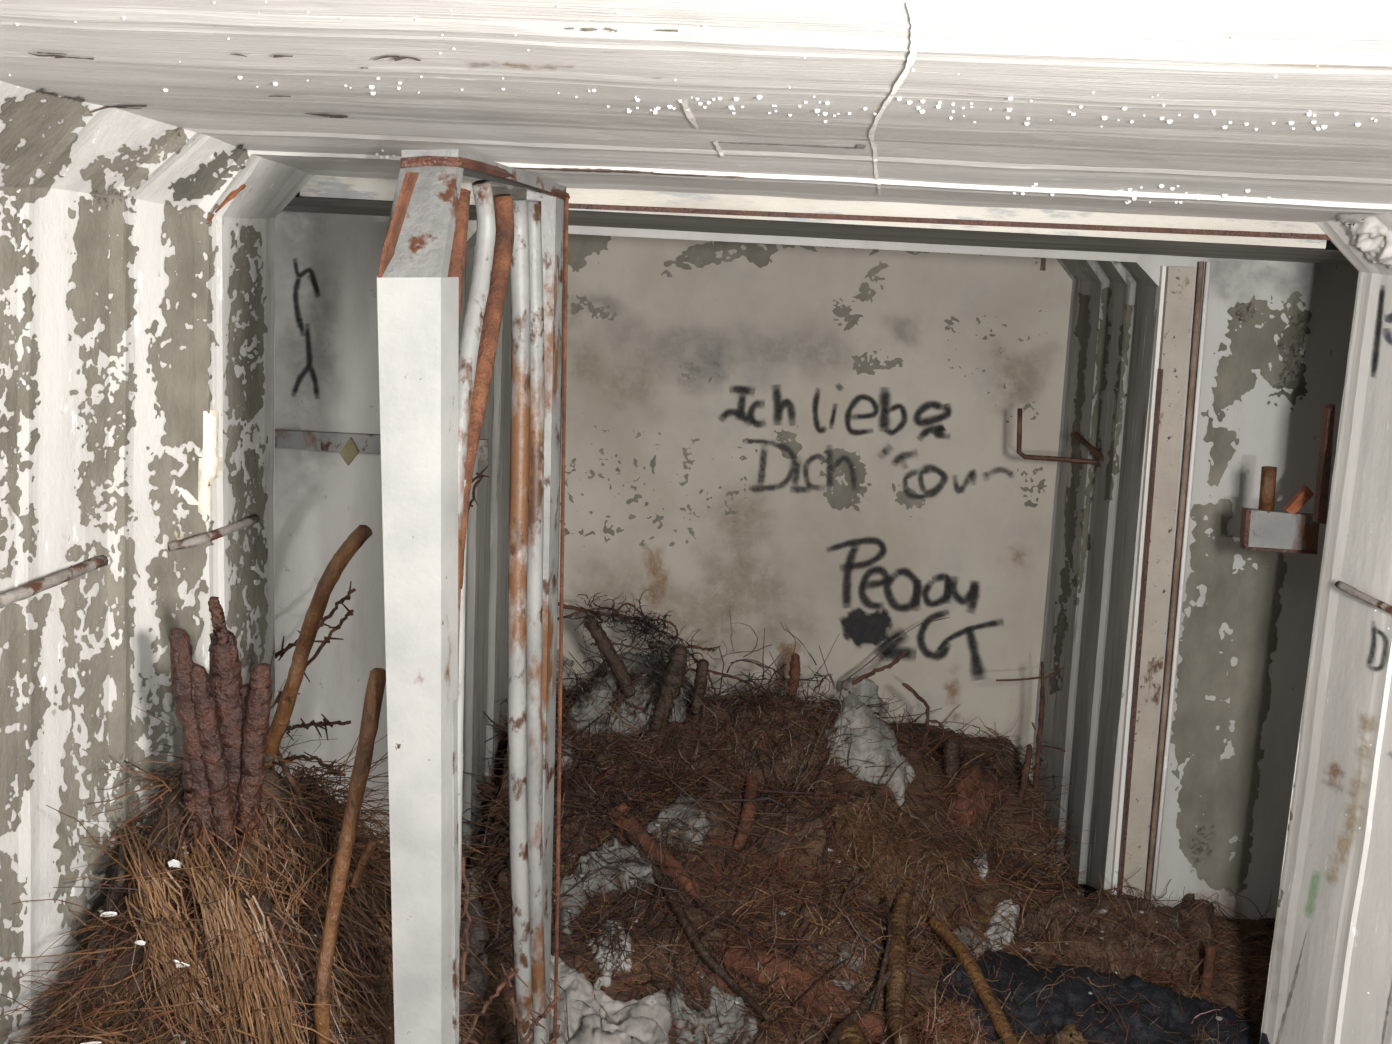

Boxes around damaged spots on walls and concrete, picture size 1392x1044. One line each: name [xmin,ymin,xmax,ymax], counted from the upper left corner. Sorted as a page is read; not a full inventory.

crack [519,2,919,195]
corrosion [378,172,419,278]
peeling [568,234,611,272]
peeling [567,295,617,321]
peeling [661,241,903,375]
peeling [944,315,1047,423]
peeling [560,425,758,549]
peeling [774,425,803,459]
peeling [819,448,872,513]
peeling [0,89,269,1044]
peeling [1170,291,1312,899]
spalling [1335,581,1392,614]